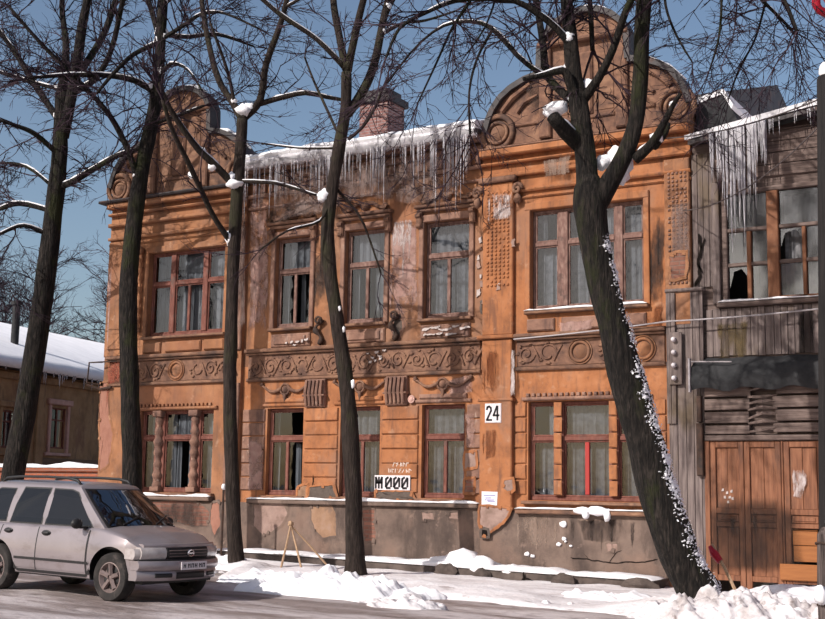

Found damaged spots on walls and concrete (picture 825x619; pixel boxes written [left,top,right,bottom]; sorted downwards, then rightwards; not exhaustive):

damp [650,205,689,299]
peeling [252,503,290,538]
peeling [296,483,338,540]